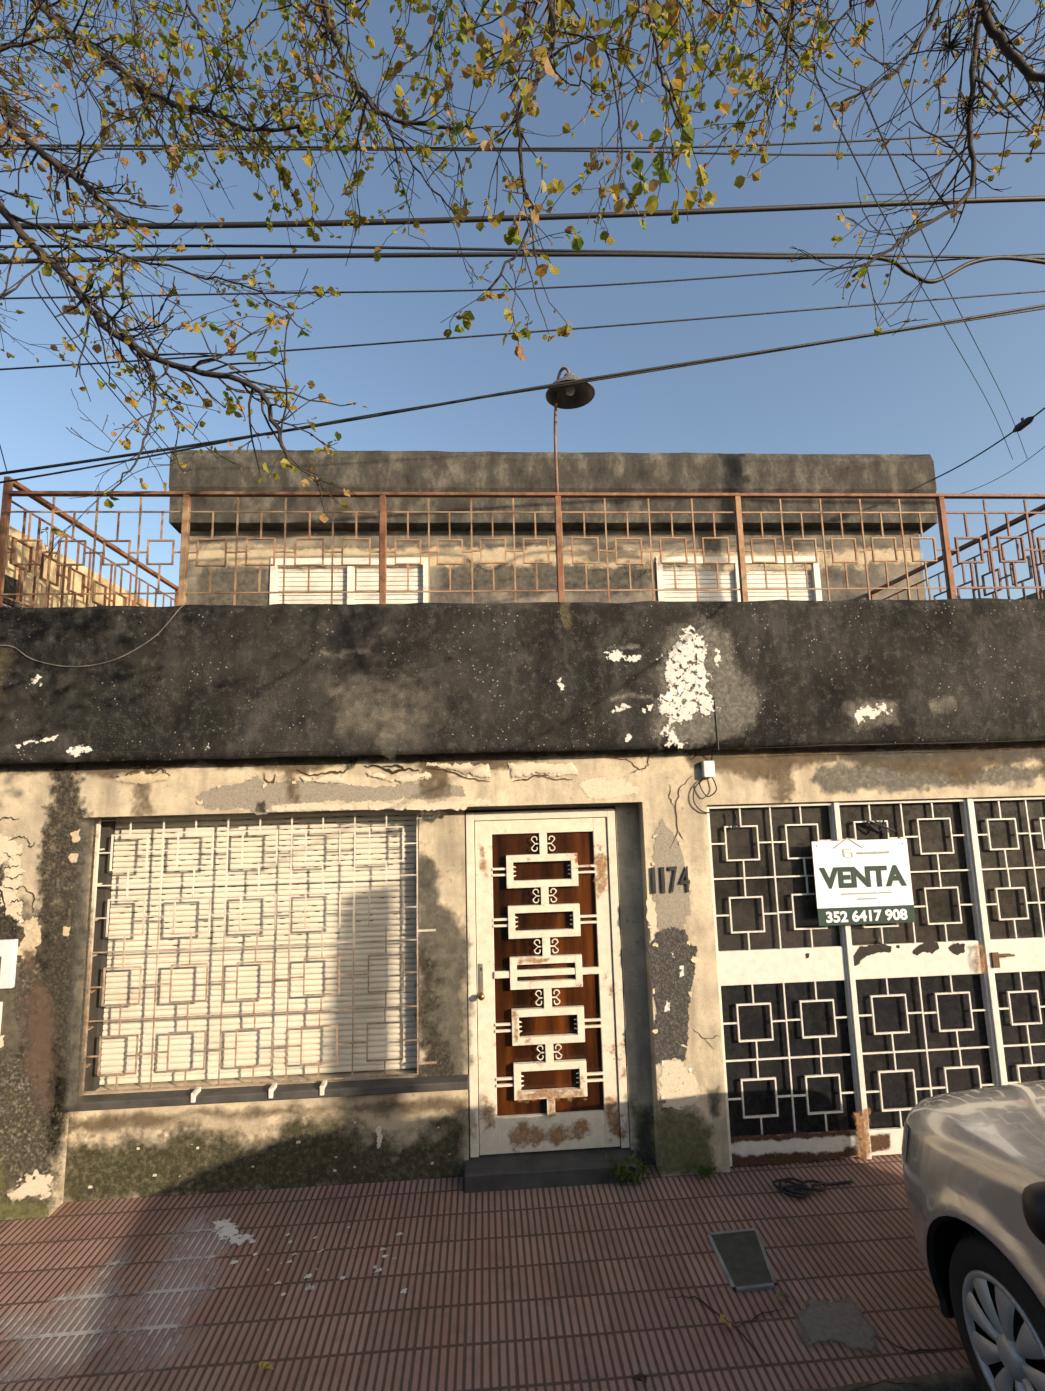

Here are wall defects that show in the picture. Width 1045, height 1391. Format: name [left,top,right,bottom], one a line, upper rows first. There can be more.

leakage [198,567,270,606]
leakage [443,559,652,595]
peeling [604,625,722,749]
peeling [195,776,492,815]
peeling [0,834,42,960]
leakage [0,617,1045,1208]
spalling [646,819,699,1110]
corrosion [510,1089,589,1147]
corrosion [605,1097,620,1134]
peeling [7,1169,54,1207]